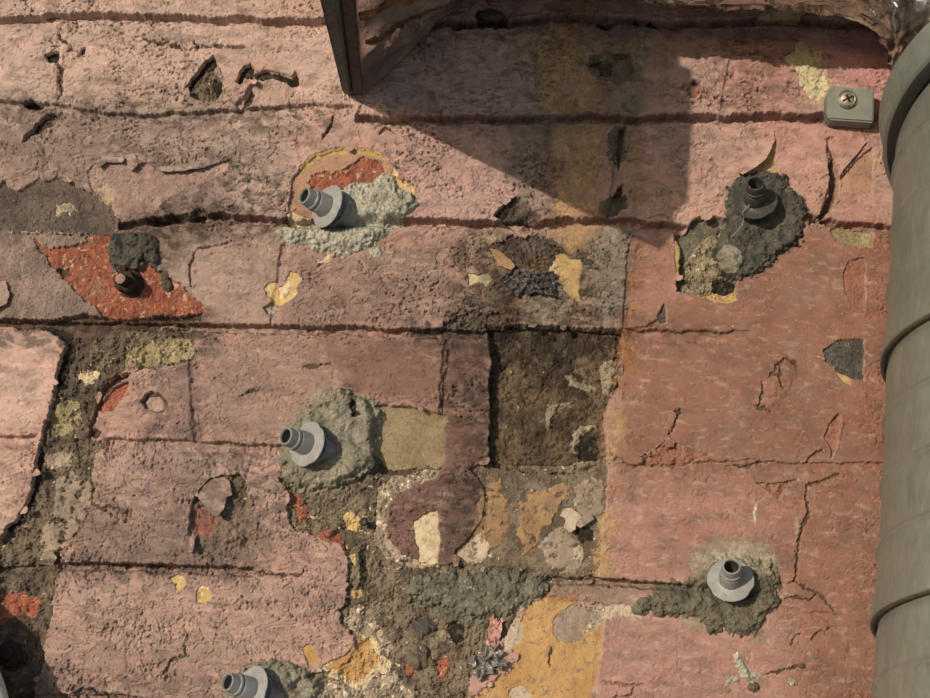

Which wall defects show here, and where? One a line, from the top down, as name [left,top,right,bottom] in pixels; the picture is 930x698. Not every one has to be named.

flaking render [182,58,223,104]
flaking render [236,67,300,110]
peeling [287,146,415,228]
crack [809,148,846,230]
peeling [468,274,492,286]
peeling [489,237,515,270]
peeling [547,238,581,301]
flaking render [674,214,737,304]
flaking render [823,339,865,385]
peeling [0,154,231,698]
spalling [280,322,642,698]
crack [764,450,840,675]